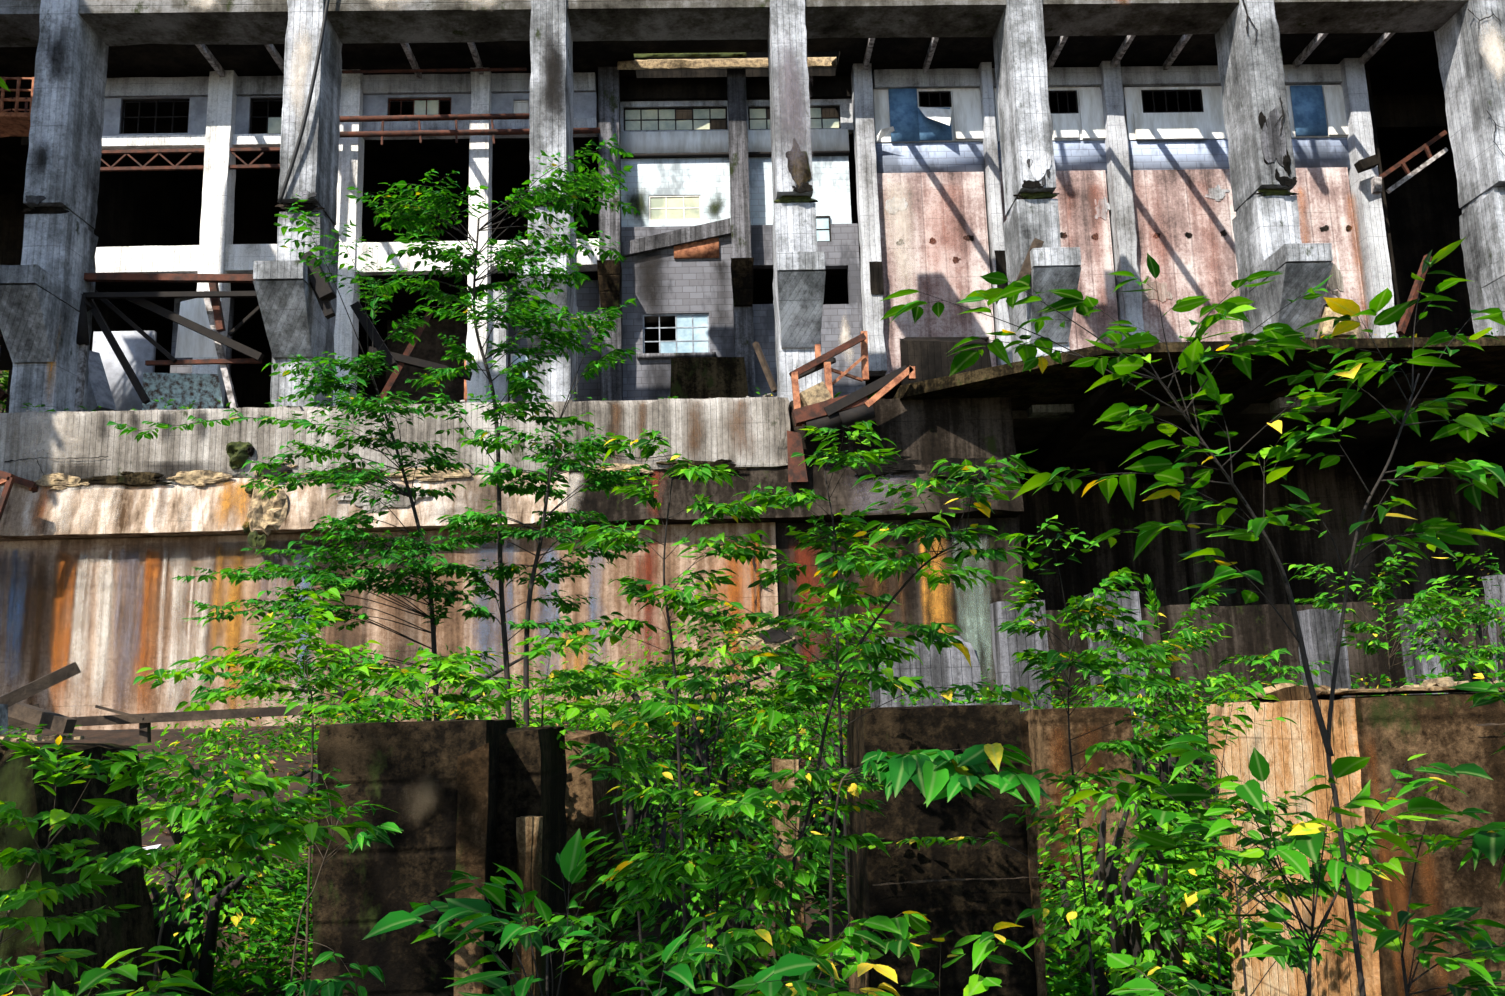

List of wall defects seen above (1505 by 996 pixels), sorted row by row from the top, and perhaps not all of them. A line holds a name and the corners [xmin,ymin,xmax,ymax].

crack [1242,0,1258,42]
crack [1274,97,1285,135]